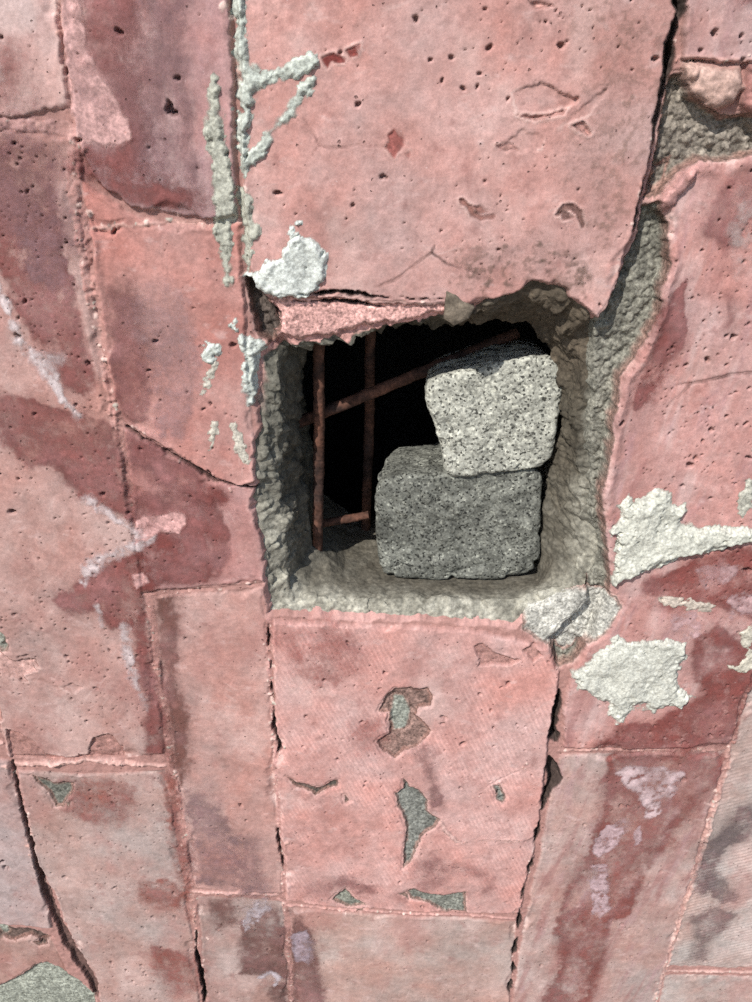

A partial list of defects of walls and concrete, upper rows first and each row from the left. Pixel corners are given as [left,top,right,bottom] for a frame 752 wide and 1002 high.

crack [650,0,686,155]
peeling [201,341,222,365]
spalling [207,74,752,666]
damp [0,140,266,907]
crack [128,425,259,488]
crack [13,760,99,996]
spalling [377,687,432,757]
spalling [396,779,440,865]
spalling [494,785,505,802]
crack [507,688,563,993]
damp [542,547,752,1002]
spalling [0,962,95,1002]